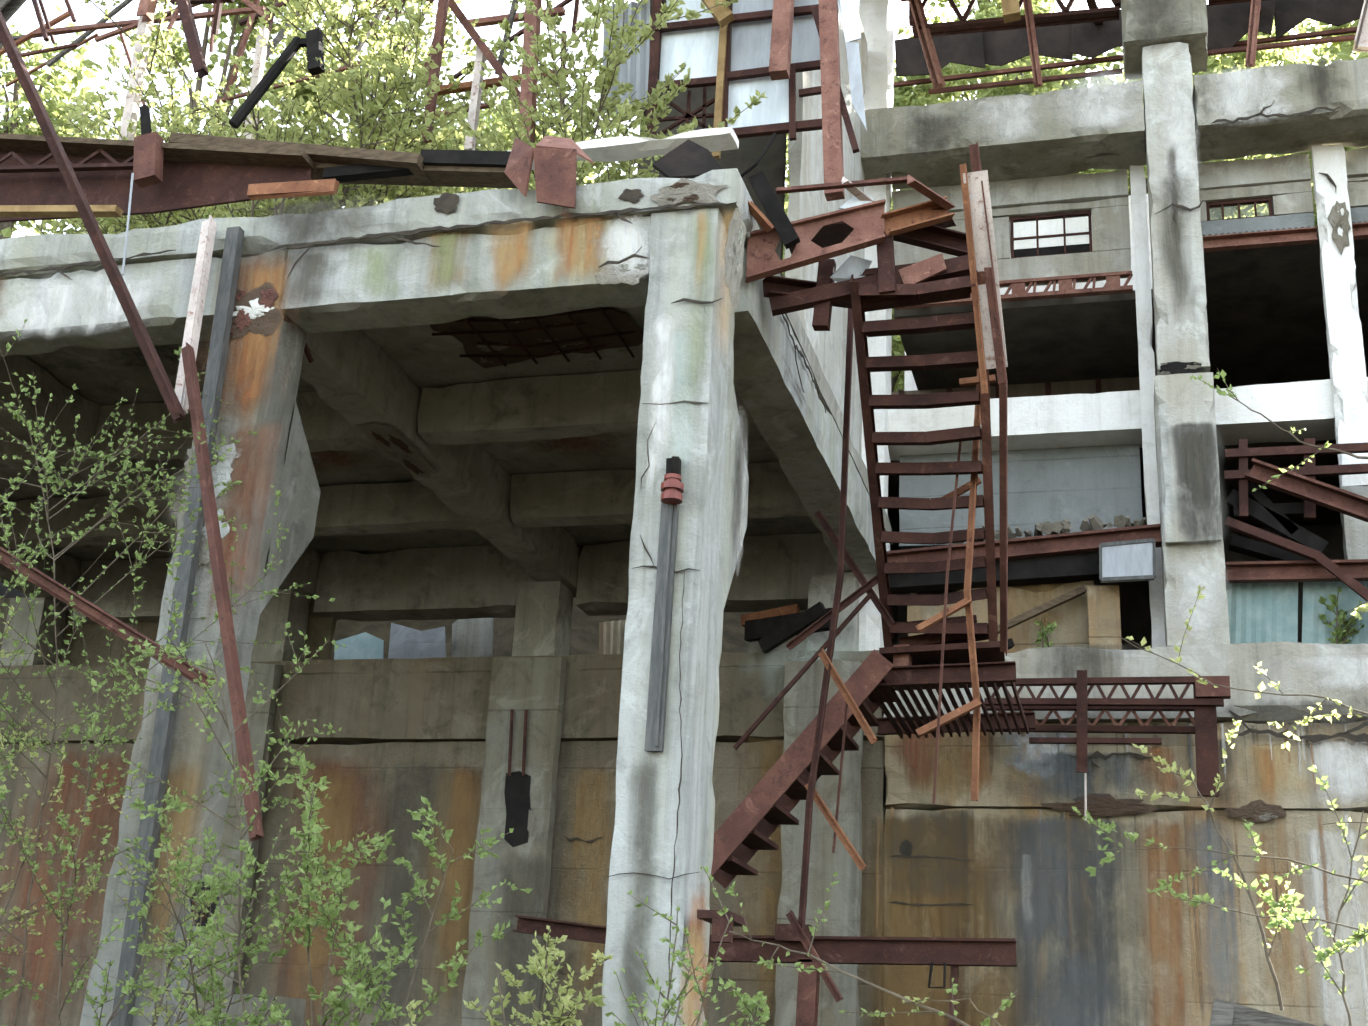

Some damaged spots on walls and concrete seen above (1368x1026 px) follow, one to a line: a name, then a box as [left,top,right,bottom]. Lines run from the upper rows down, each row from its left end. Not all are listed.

crack [1210,100,1340,124]
spalling [618,178,746,311]
spalling [1327,201,1351,255]
rust [237,257,283,307]
spalling [595,263,650,285]
spalling [229,282,284,341]
rust [213,430,268,588]
rust [900,732,993,788]
spalling [1040,793,1159,816]
spalling [1225,799,1286,823]
rust [1148,815,1202,1026]
rust [1258,859,1289,957]